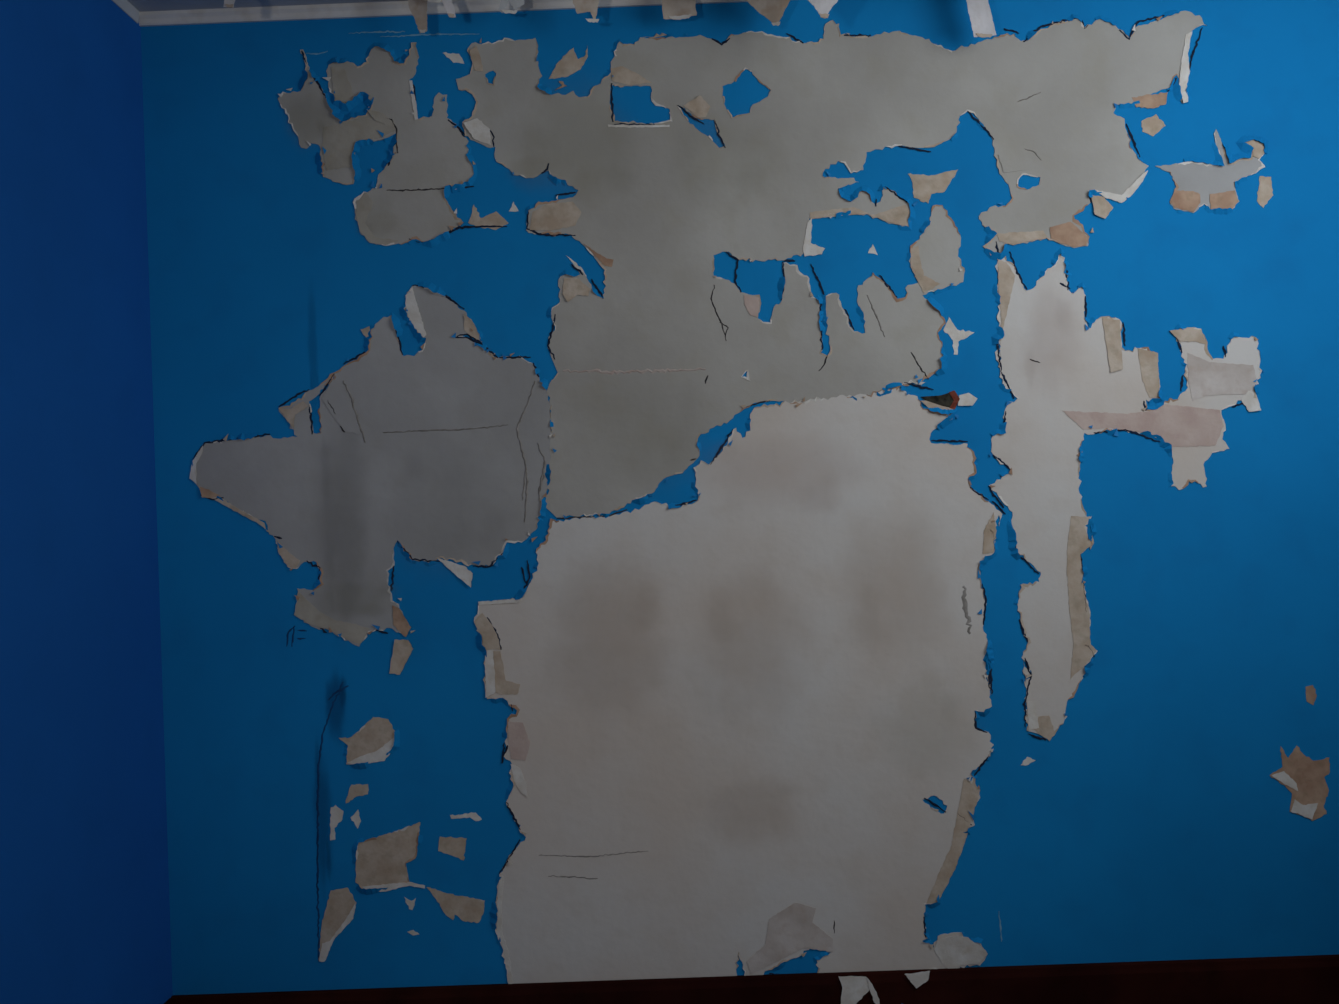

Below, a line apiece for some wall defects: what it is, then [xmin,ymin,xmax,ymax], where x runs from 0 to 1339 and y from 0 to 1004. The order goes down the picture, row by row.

peeling [189,0,1273,988]
peeling [1270,745,1330,821]
peeling [838,976,880,1004]